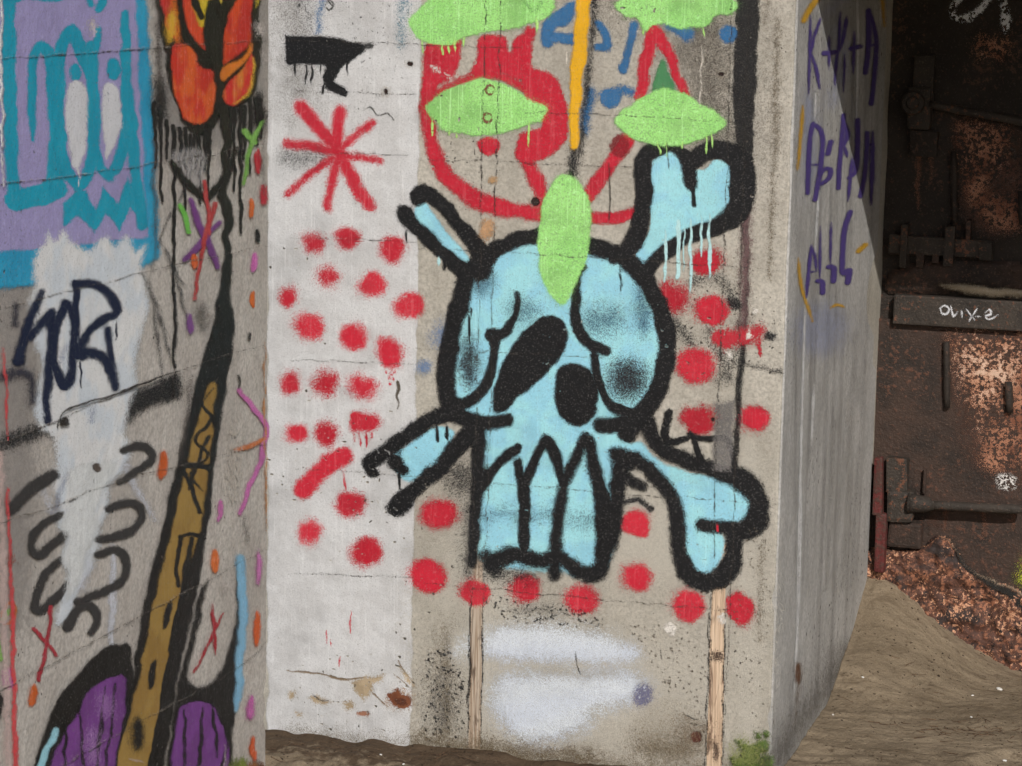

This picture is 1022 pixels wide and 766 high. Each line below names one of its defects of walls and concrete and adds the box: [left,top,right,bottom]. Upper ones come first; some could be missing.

corrosion [943,114,1022,241]
corrosion [928,327,1022,488]